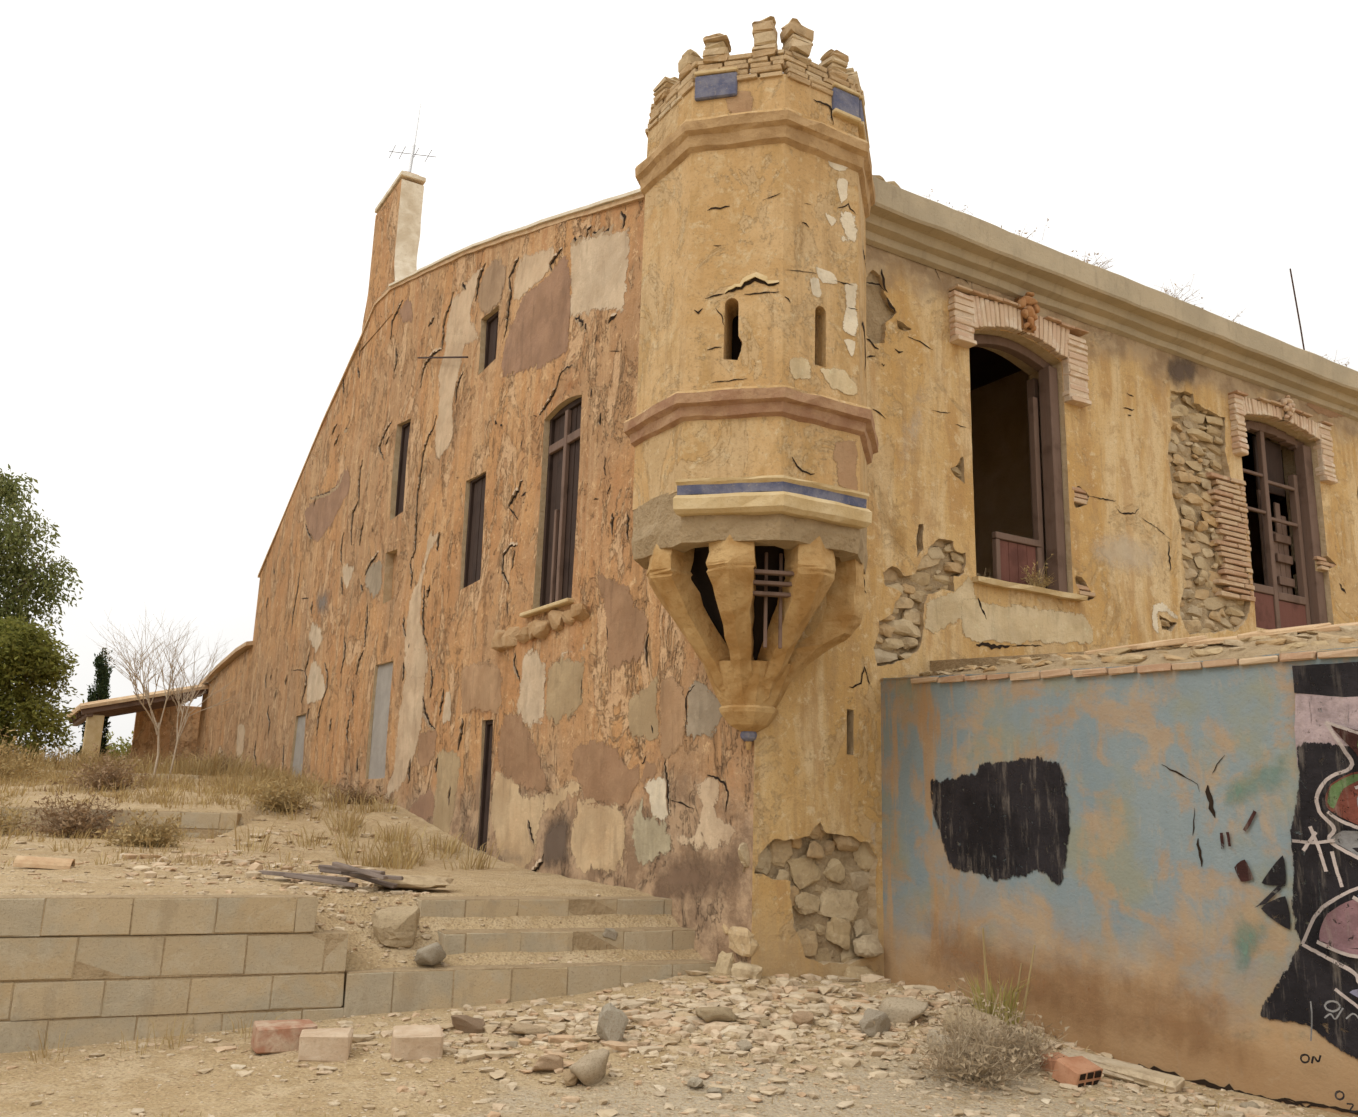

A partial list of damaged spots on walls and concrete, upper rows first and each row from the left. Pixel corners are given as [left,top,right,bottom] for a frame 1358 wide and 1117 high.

crack [764,193,856,227]
peeling [826,161,858,242]
crack [694,249,931,383]
spalling [810,267,908,356]
peeling [789,357,858,396]
crack [1090,496,1171,570]
spalling [1152,393,1245,634]
spalling [874,540,1095,666]
peeling [306,622,326,704]
peeling [384,531,438,799]
spalling [491,676,874,963]
crack [1161,755,1225,867]